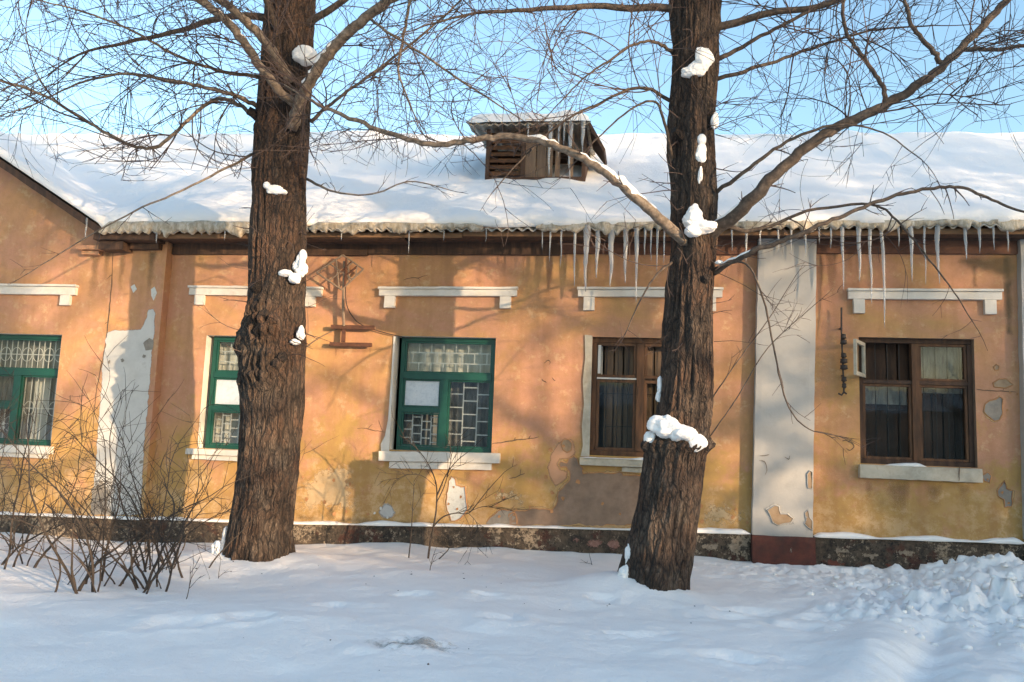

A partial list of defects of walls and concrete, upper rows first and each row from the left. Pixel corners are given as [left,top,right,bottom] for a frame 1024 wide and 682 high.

peeling [91,287,157,515]
flaking render [983,364,1018,422]
peeling [373,504,395,519]
peeling [443,476,468,522]
peeling [544,440,575,495]
flaking render [766,503,813,531]
flaking render [983,472,1014,508]